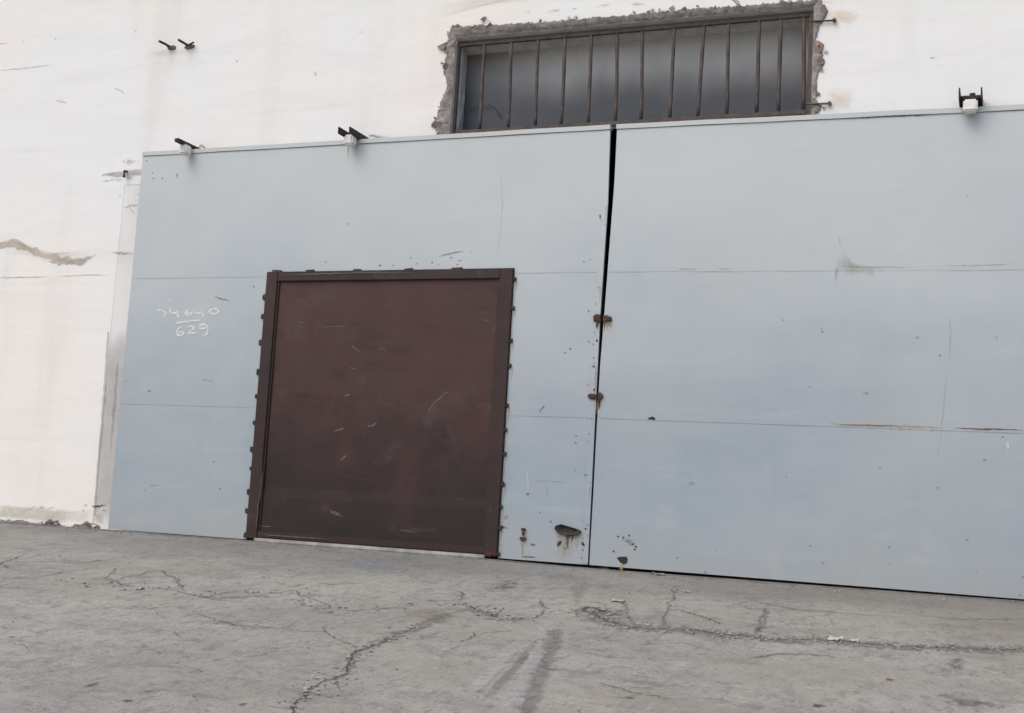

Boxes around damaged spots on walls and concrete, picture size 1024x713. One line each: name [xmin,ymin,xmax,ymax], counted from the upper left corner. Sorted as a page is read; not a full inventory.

flaking render [431,0,828,135]
rust [588,323,612,419]
rust [833,423,938,431]
crack [0,555,547,713]
crack [579,588,889,658]
crack [915,643,1023,651]